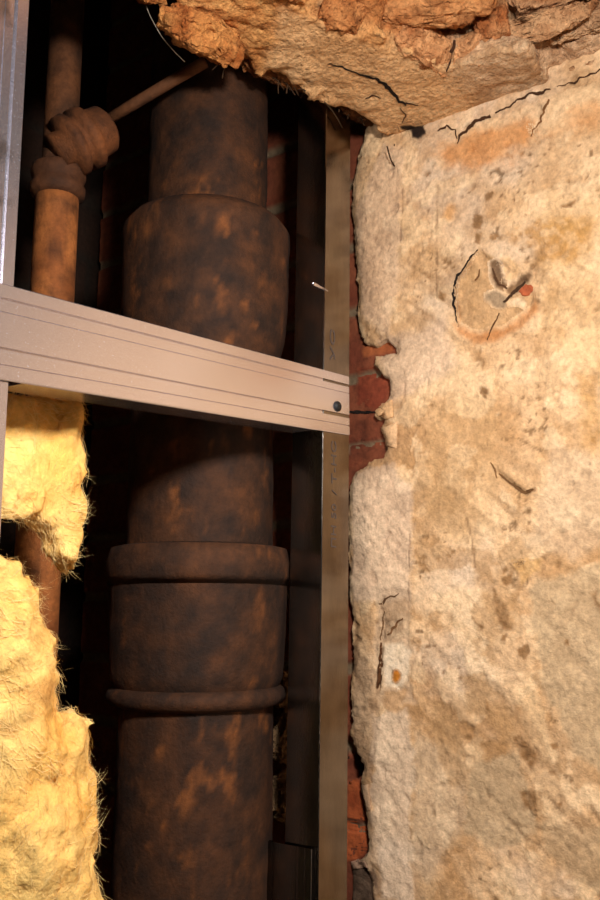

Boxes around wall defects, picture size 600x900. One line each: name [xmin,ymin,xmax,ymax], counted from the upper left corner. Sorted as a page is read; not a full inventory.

spalling [318,0,366,35]
crack [327,63,418,123]
crack [446,39,456,72]
spalling [382,0,600,77]
crack [437,69,600,144]
crack [452,249,480,327]
flaking render [349,337,398,474]